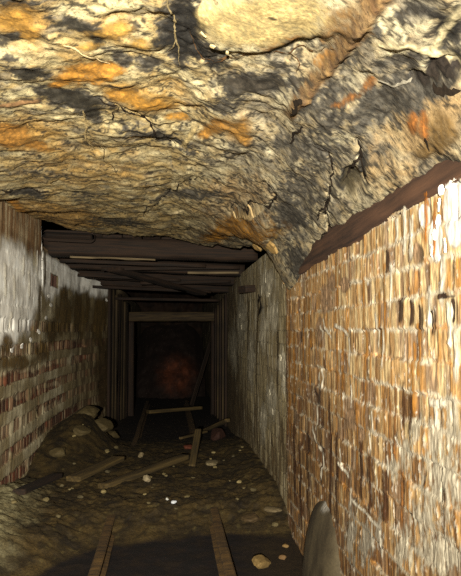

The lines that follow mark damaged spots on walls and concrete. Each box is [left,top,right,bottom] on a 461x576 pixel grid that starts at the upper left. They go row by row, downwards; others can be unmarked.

damp [36,251,46,327]
damp [0,286,108,406]